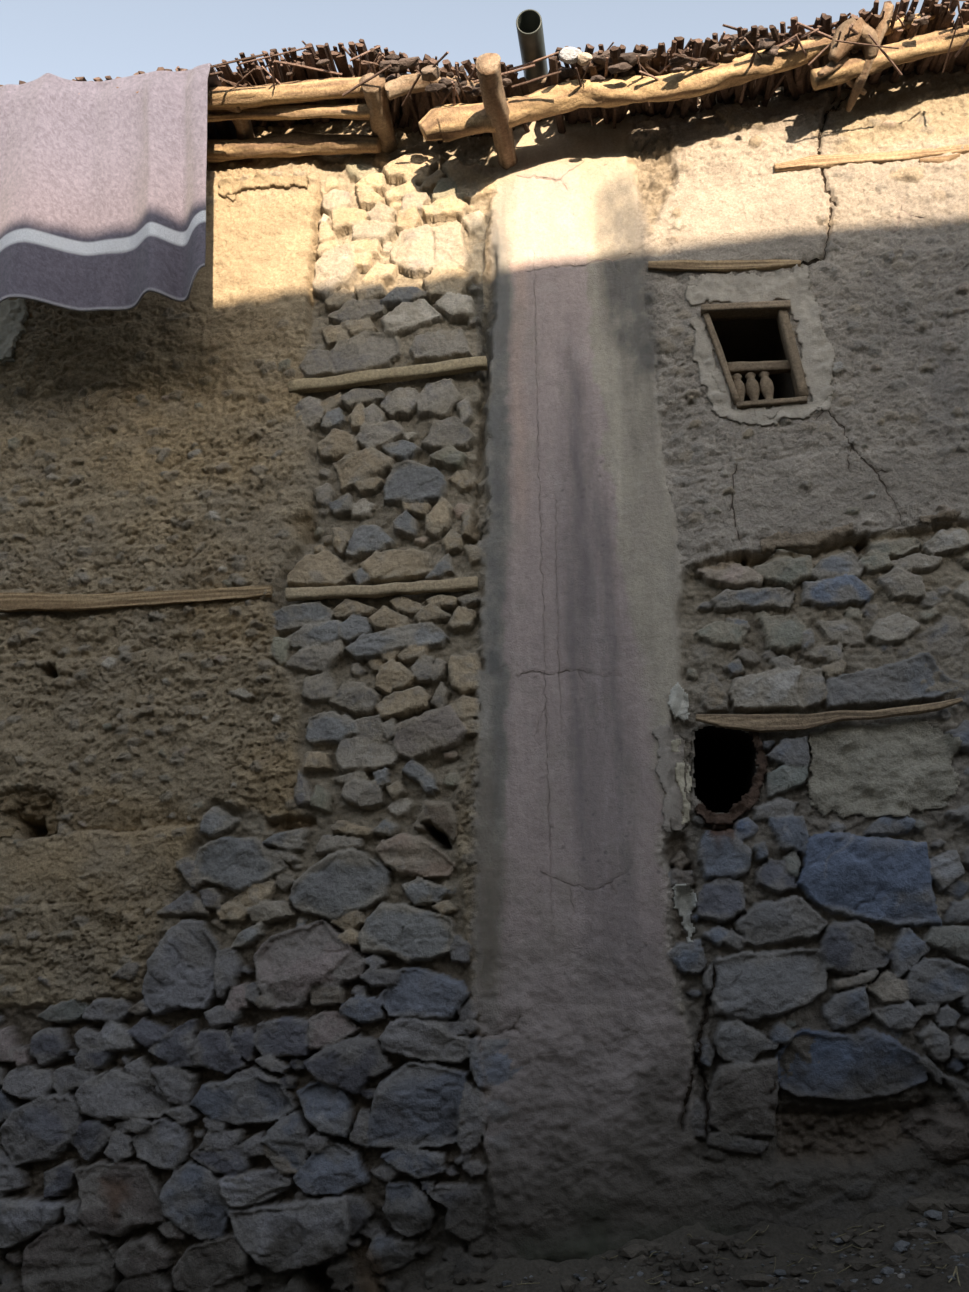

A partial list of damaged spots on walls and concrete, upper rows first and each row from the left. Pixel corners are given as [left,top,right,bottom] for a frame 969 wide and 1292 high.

crack [801,96,848,266]
leakage [609,211,652,367]
crack [815,410,902,524]
crack [516,253,635,946]
crack [680,963,716,1139]